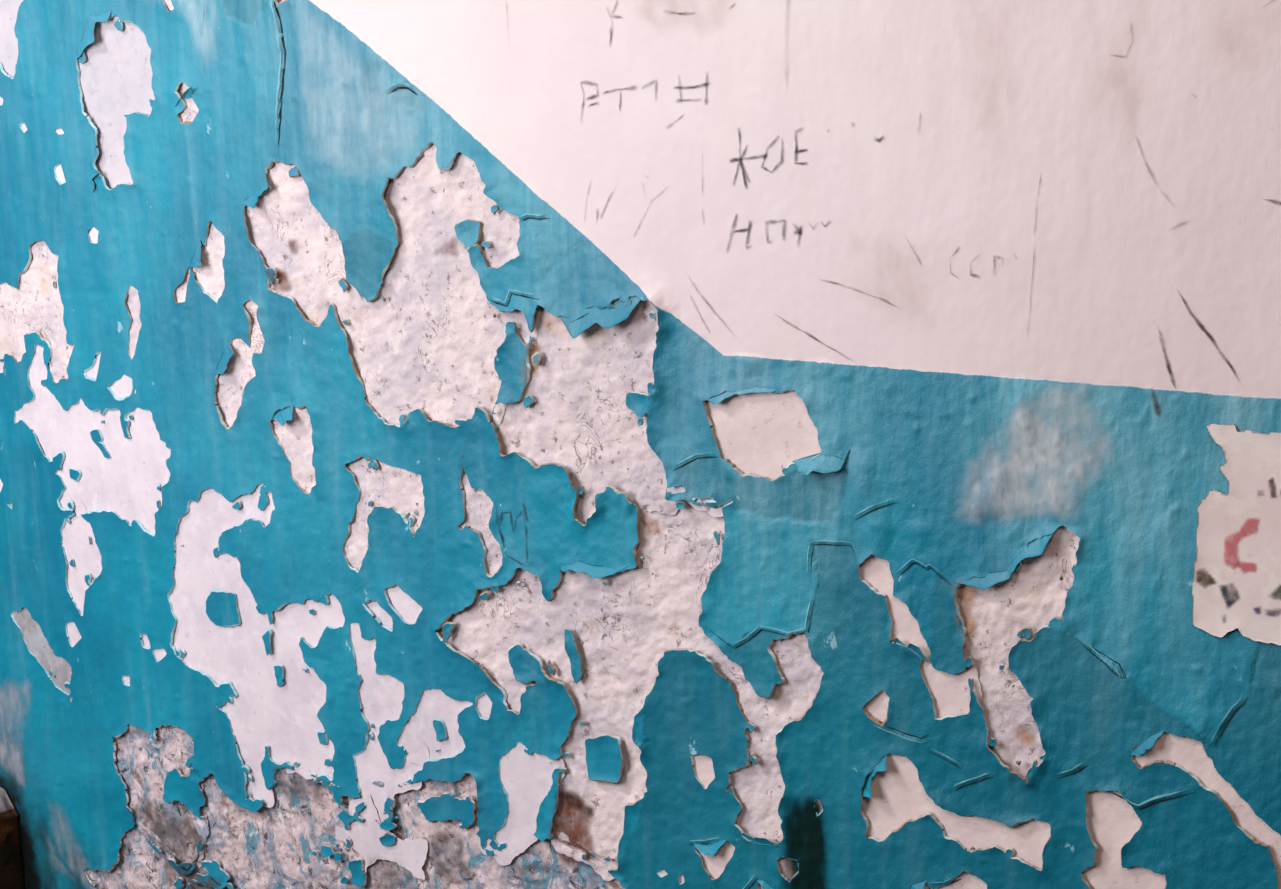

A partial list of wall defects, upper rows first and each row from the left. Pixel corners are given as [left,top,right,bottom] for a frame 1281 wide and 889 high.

peeling [0,0,23,79]
peeling [75,10,155,192]
peeling [174,81,199,124]
crack [270,0,286,149]
peeling [0,240,171,702]
peeling [85,142,824,889]
peeling [703,386,850,481]
peeling [858,524,1080,784]
peeling [909,871,987,889]
peeling [860,754,1051,871]
peeling [1081,789,1166,889]
peeling [1131,731,1281,889]